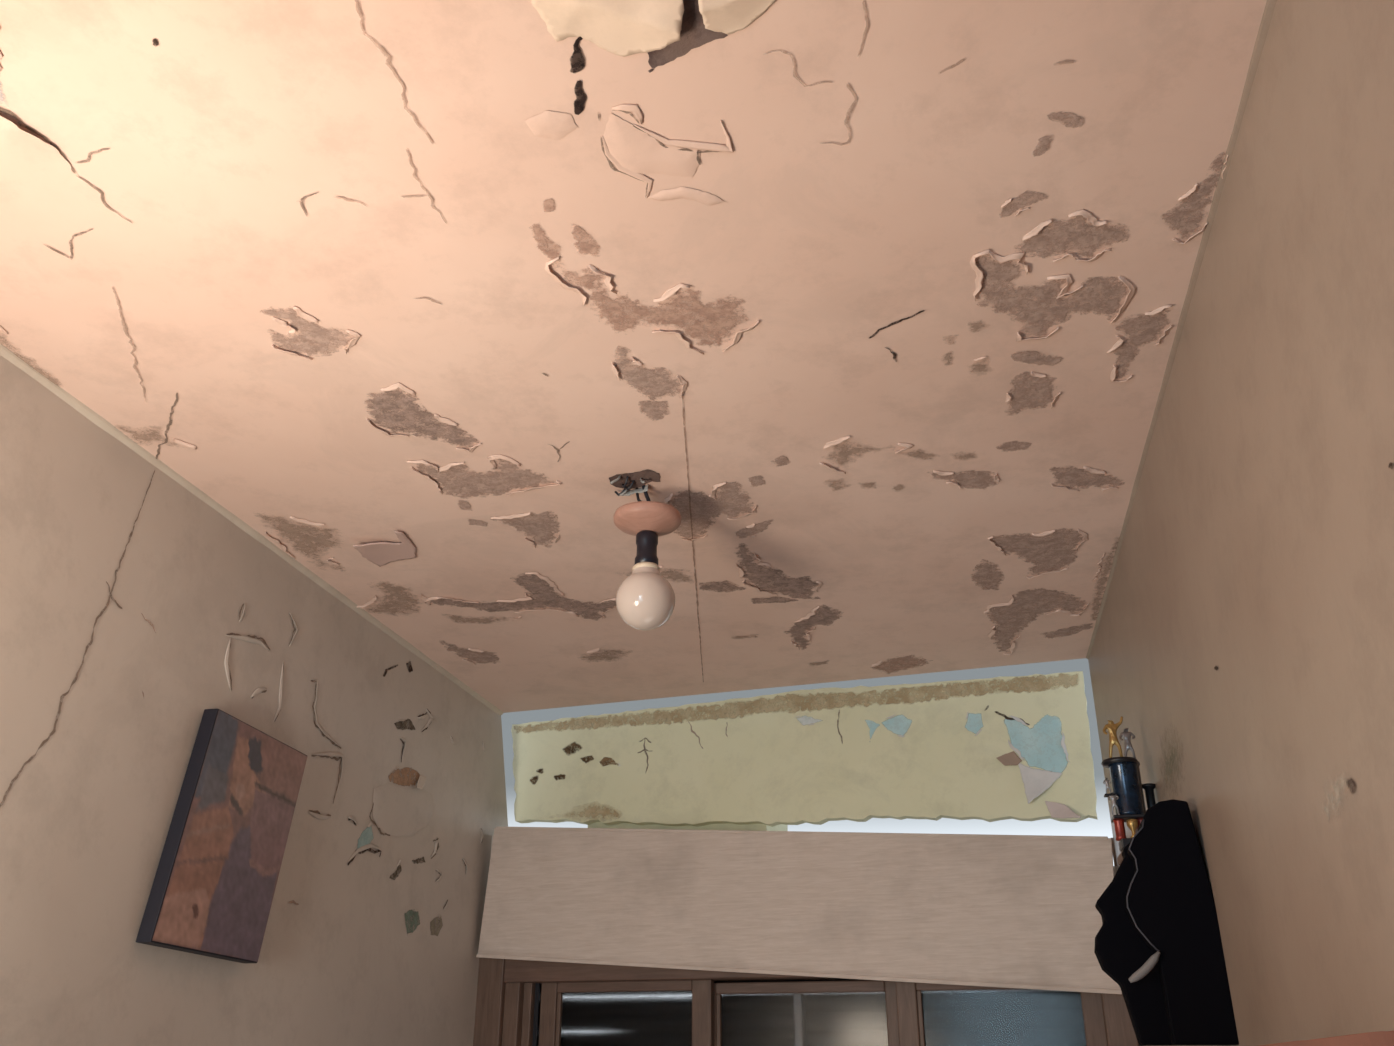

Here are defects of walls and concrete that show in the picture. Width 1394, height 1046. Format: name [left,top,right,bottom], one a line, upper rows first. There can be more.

peeling [0,91,74,184]
crack [0,108,131,258]
crack [355,0,446,223]
crack [767,1,869,145]
peeling [532,199,759,355]
peeling [970,210,1172,415]
peeling [365,383,561,548]
crack [0,288,178,806]
peeling [353,531,617,623]
peeling [659,476,841,665]
damp [514,674,1078,732]
peeling [997,715,1069,773]